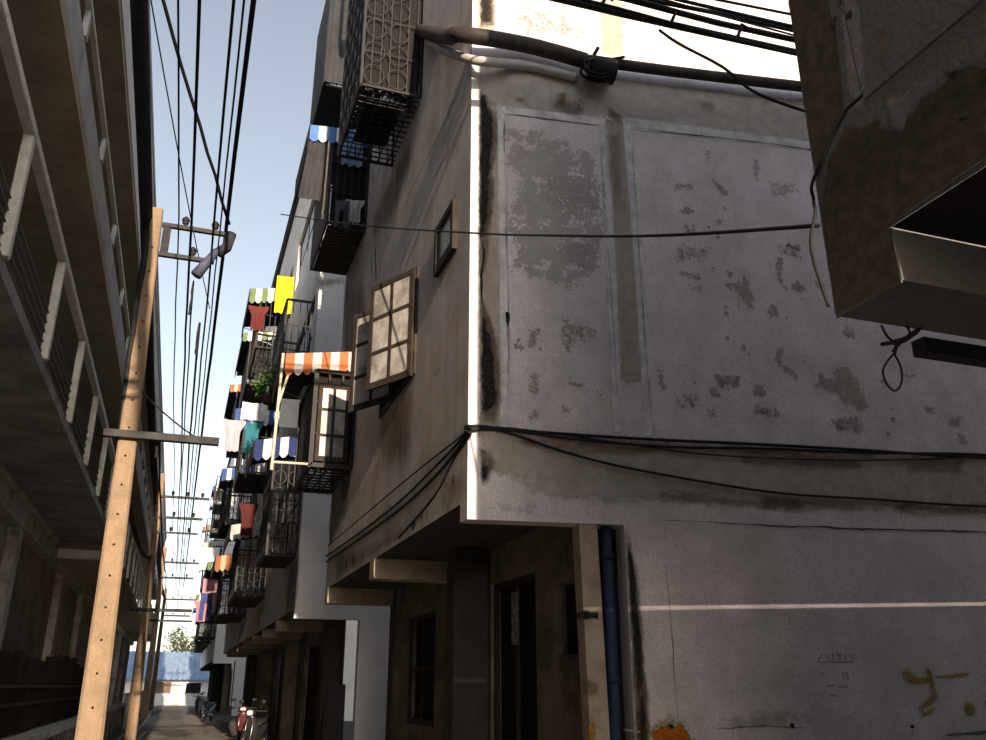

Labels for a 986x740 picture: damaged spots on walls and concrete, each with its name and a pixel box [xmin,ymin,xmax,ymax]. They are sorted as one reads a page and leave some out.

peeling [478,0,592,42]
damp [480,96,500,422]
peeling [478,92,605,426]
peeling [676,207,754,316]
peeling [775,242,825,300]
peeling [710,373,779,418]
peeling [815,365,870,434]
damp [481,450,492,480]
damp [628,552,649,740]